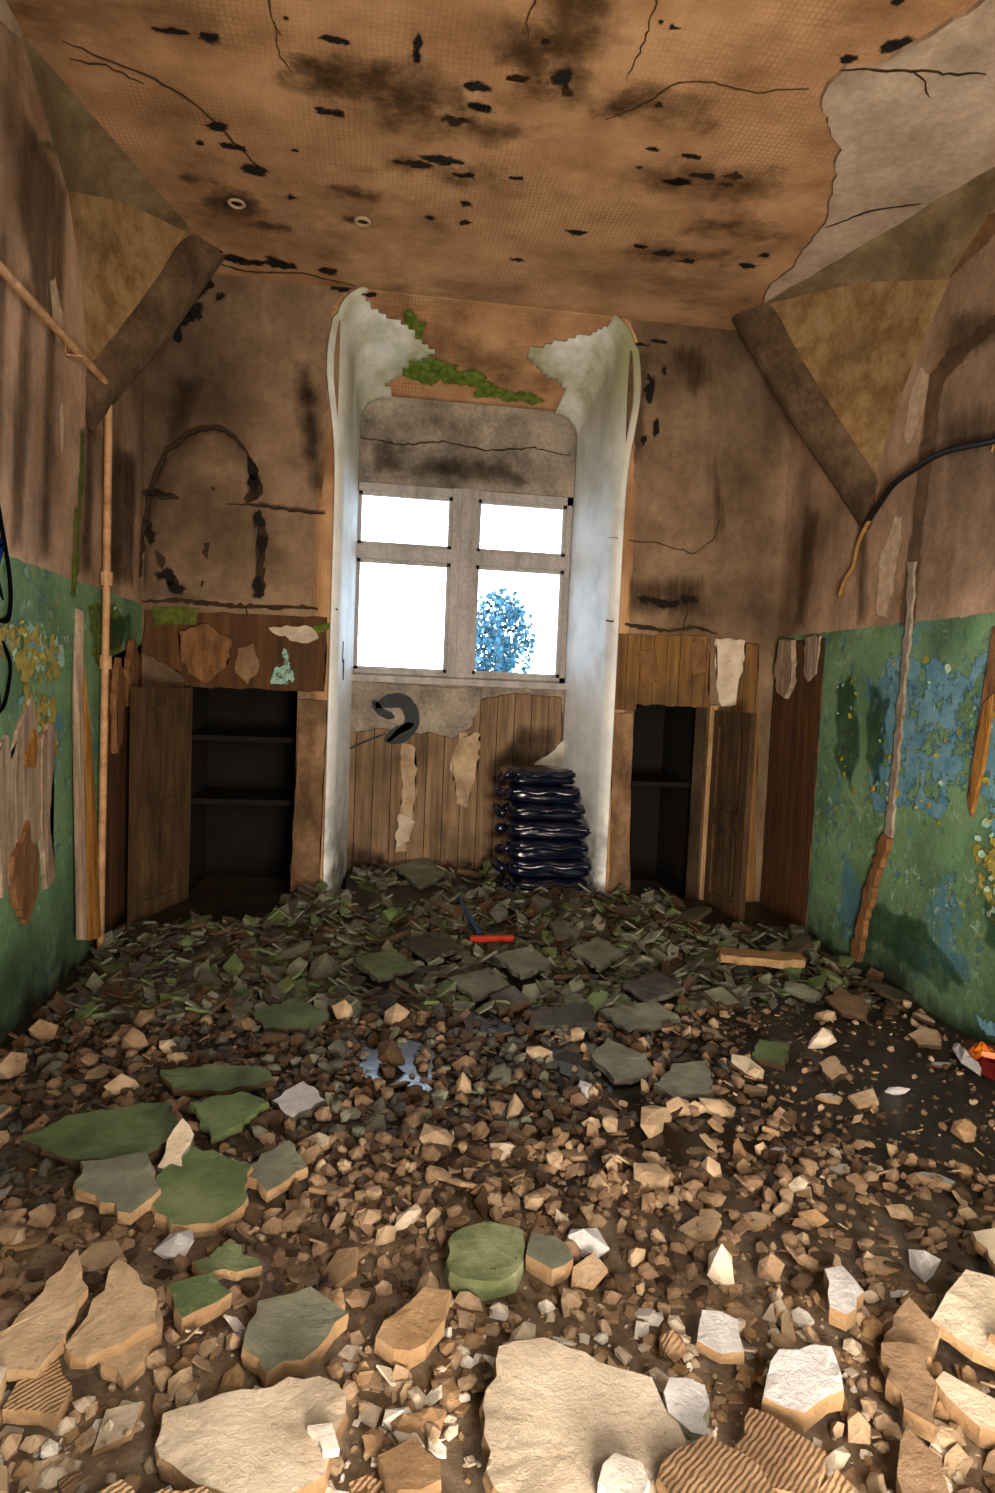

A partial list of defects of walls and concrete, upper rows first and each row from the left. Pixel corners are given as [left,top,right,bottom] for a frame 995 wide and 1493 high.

crack [62,40,258,166]
leakage [151,27,219,45]
crack [268,0,291,72]
leakage [305,33,507,137]
crack [525,0,537,49]
leakage [511,0,609,97]
crack [605,0,809,120]
crack [841,68,986,98]
leakage [195,121,270,177]
leakage [392,155,475,183]
peeling [762,0,995,303]
spalling [691,638,745,707]